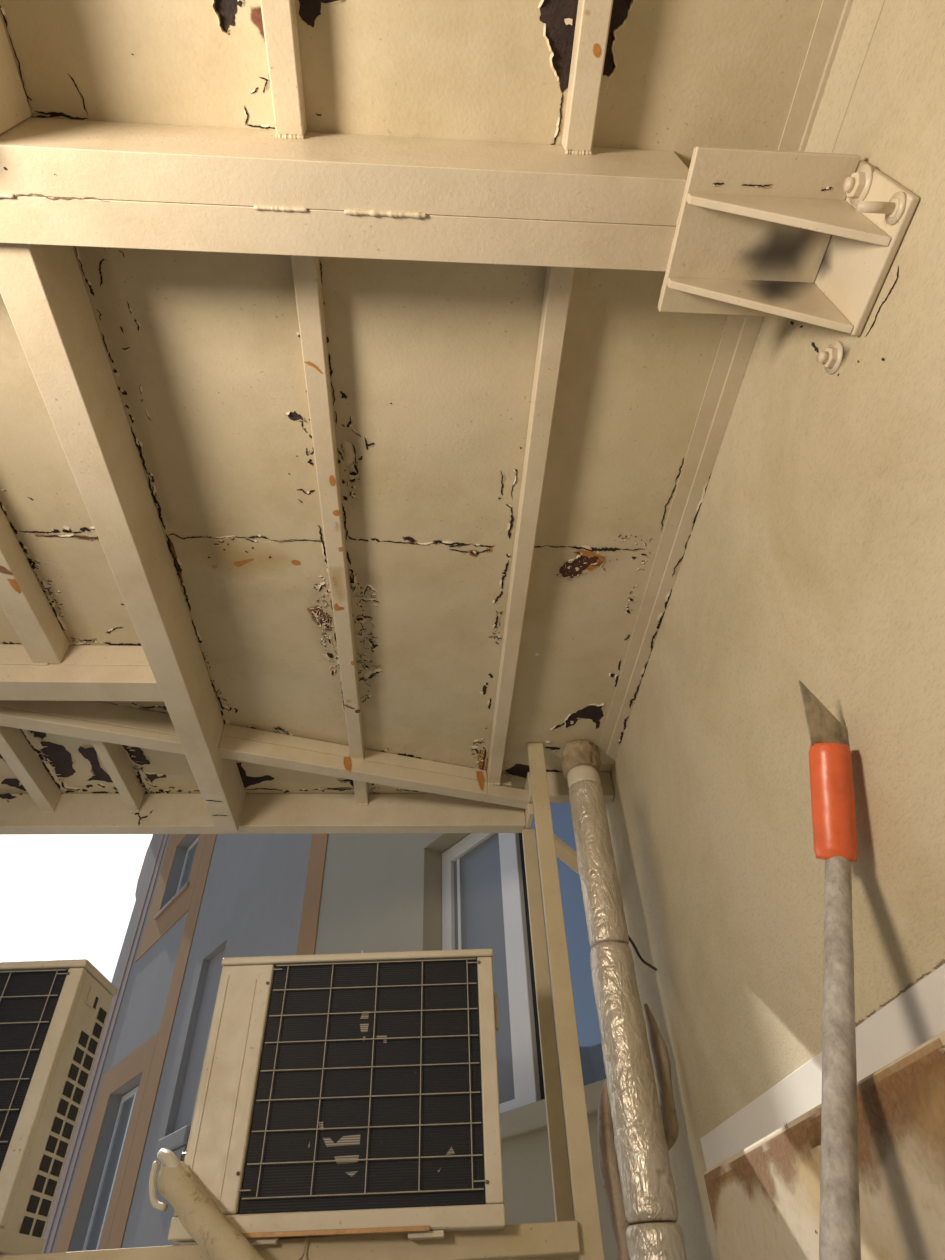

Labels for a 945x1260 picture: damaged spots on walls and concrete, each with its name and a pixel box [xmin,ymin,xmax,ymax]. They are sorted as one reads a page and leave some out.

peeling [212,0,245,35]
peeling [299,0,343,27]
peeling [538,0,578,93]
peeling [603,0,635,78]
crack [74,246,711,744]
crack [0,489,142,646]
crack [469,674,493,770]
peeling [544,703,604,752]
peeling [0,778,27,802]
peeling [28,730,113,783]
peeling [237,763,276,788]
peeling [503,763,530,778]